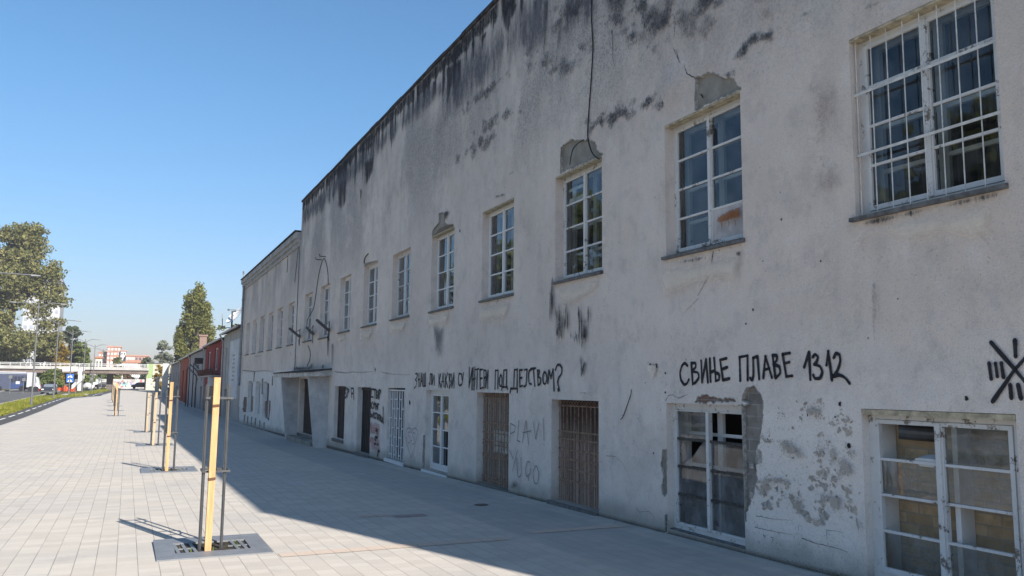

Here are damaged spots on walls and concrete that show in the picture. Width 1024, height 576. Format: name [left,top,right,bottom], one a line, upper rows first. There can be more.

water stain [302,0,548,222]
flaking render [694,72,742,111]
flaking render [560,139,603,174]
water stain [549,280,595,342]
flaking render [694,385,860,533]